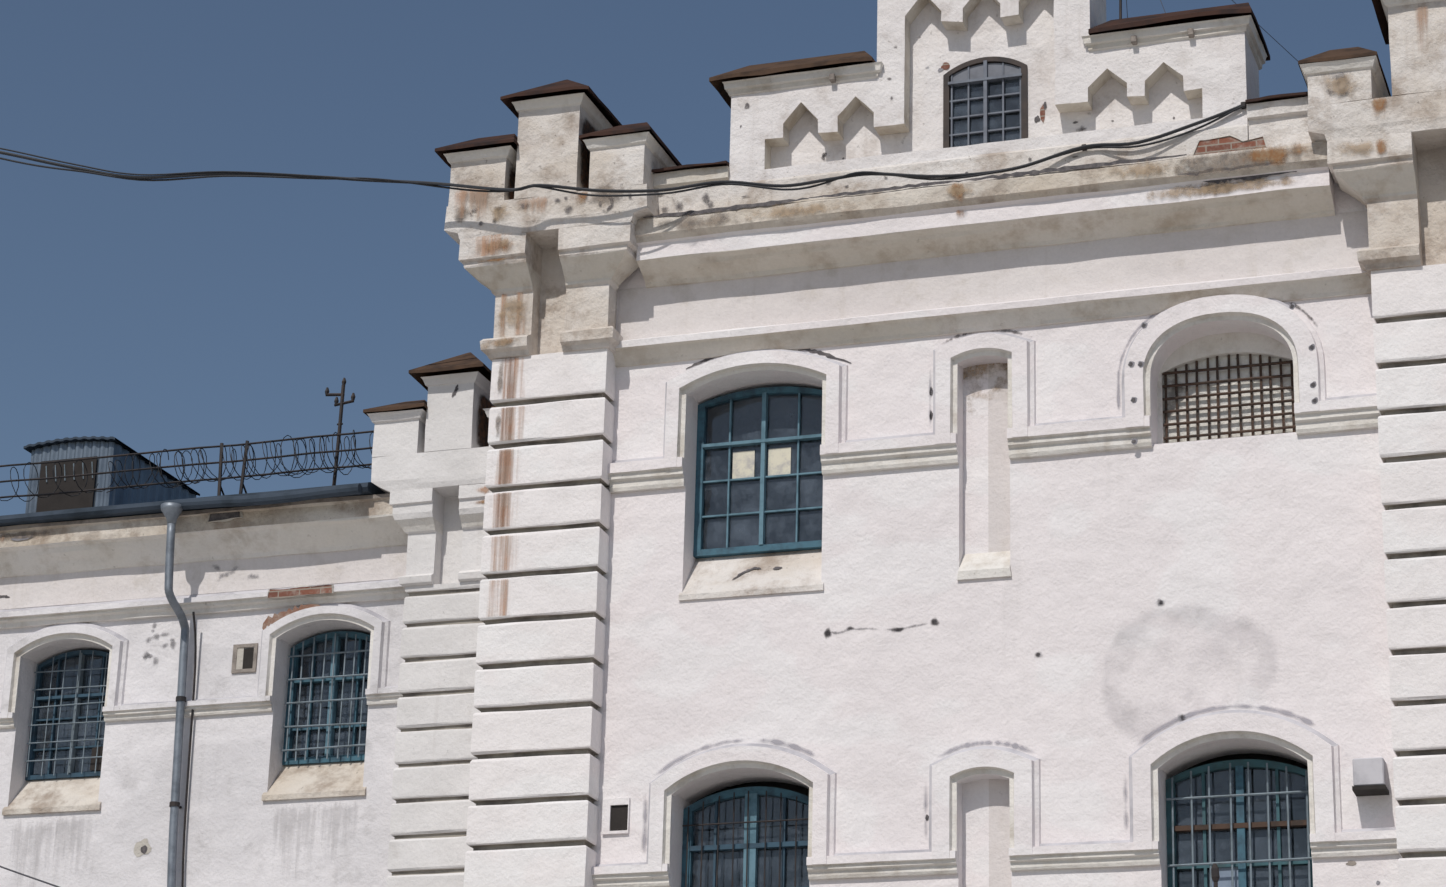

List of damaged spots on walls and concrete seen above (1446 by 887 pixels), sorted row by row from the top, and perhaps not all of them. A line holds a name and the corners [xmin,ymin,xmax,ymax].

spalling [1176,134,1297,194]